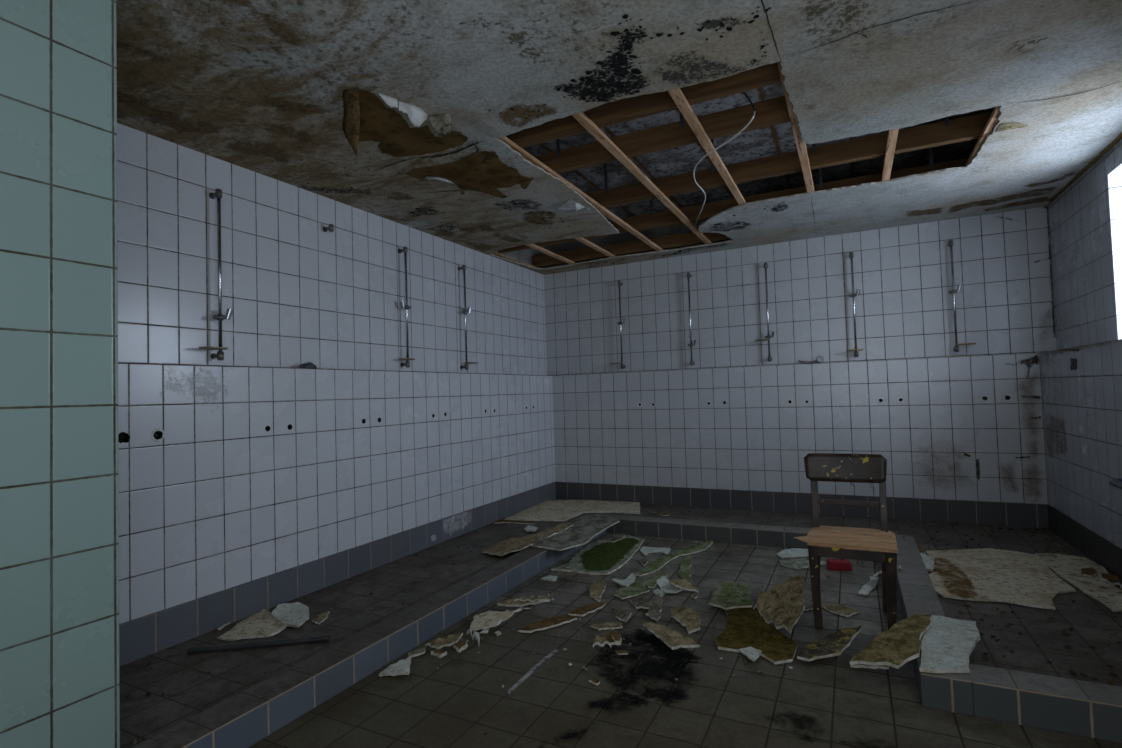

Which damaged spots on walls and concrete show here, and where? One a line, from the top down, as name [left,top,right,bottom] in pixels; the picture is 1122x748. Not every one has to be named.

leakage [228,0,301,59]
leakage [460,13,549,70]
leakage [550,6,771,103]
leakage [117,92,219,133]
peeling [342,88,534,198]
leakage [488,104,556,127]